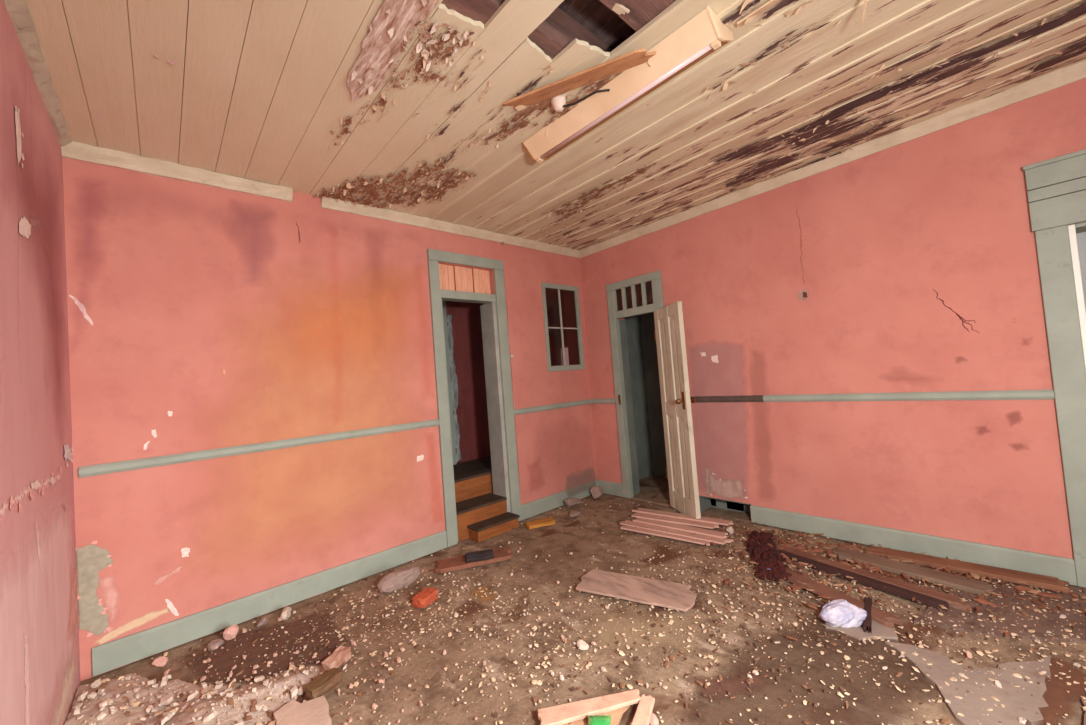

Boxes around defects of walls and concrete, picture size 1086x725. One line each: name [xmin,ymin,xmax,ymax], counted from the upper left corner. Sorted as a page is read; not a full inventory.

peeling [15,106,24,168]
peeling [329,0,486,148]
peeling [313,66,625,209]
peeling [704,0,1086,192]
peeling [19,217,37,239]
crack [933,289,979,333]
spalling [69,540,179,644]
peeling [154,547,190,585]